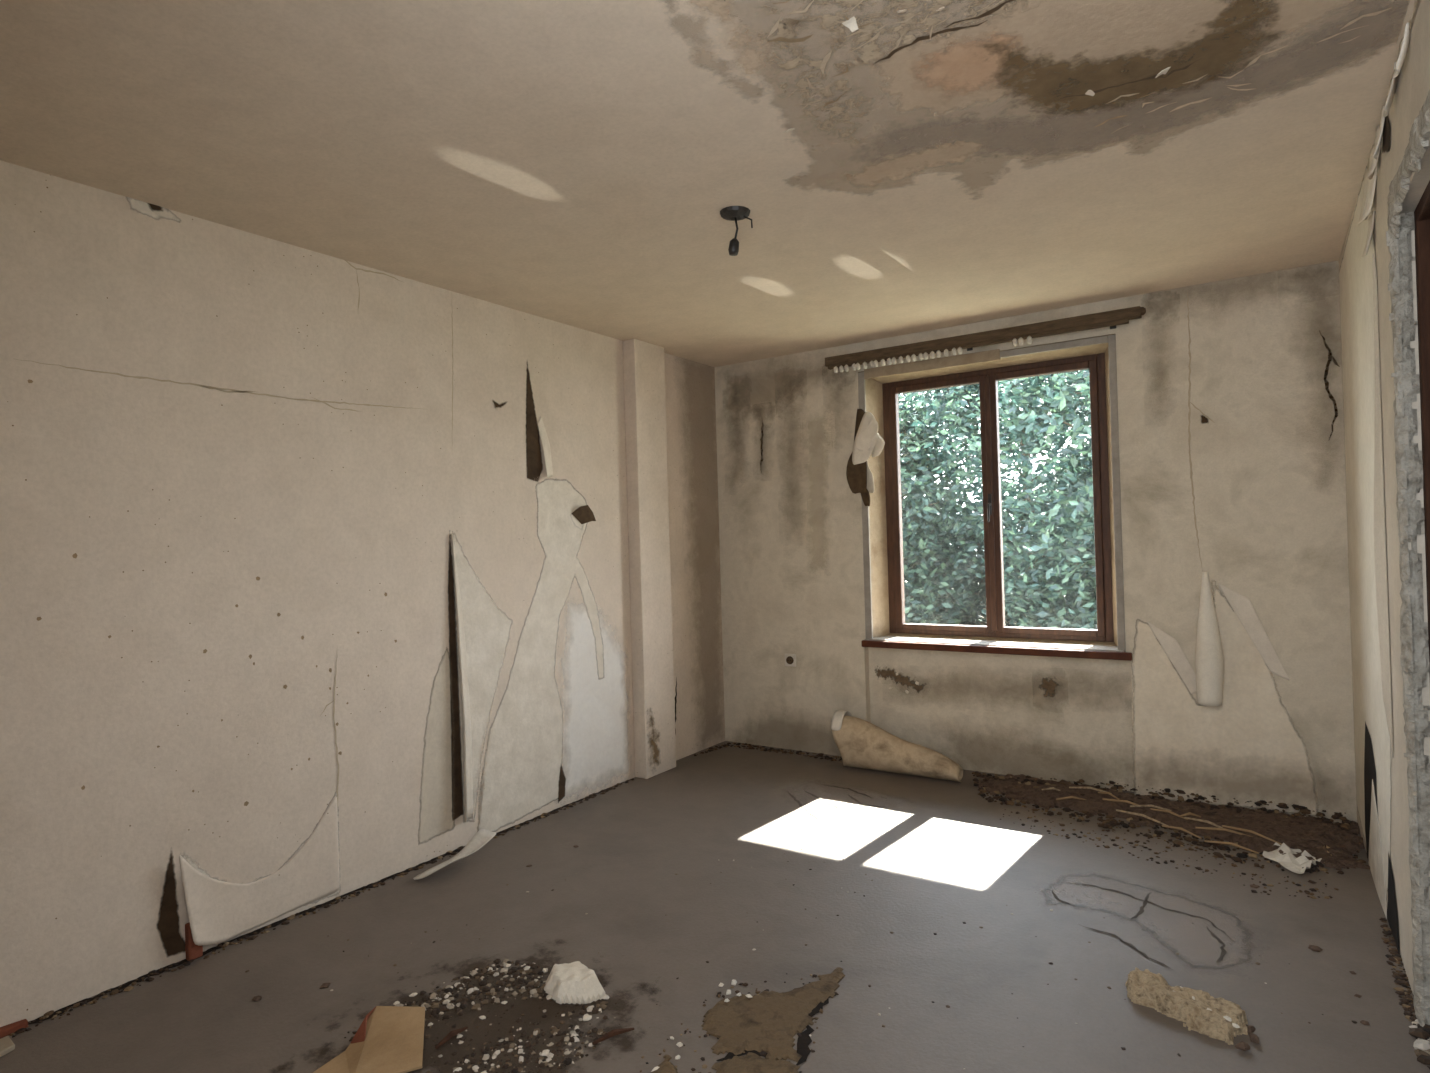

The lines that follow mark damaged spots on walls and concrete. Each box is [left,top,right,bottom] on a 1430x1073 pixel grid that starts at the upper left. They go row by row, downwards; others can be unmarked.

water stain [735,0,1349,141]
water stain [848,142,979,185]
crack [1319,330,1340,439]
peeling [846,409,885,506]
peeling [1339,0,1430,1027]
peeling [478,479,604,832]
peeling [1132,572,1318,816]